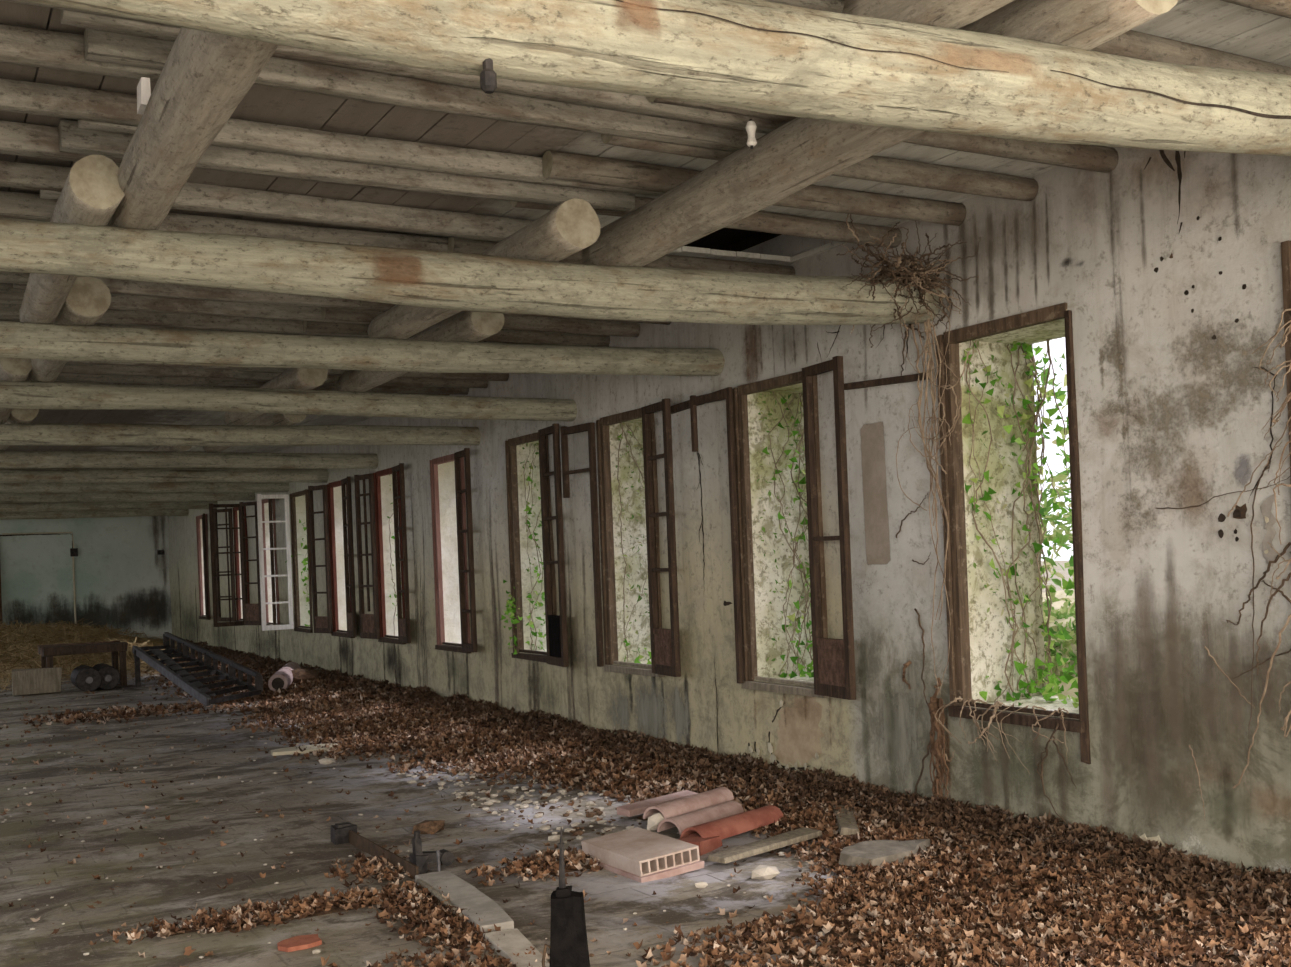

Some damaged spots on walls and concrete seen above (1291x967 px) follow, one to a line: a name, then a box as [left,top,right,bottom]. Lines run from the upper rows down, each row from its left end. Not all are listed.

crack [1050,70,1291,119]
damp [945,218,1018,323]
damp [1033,200,1049,290]
damp [1093,324,1269,498]
damp [9,573,198,641]
damp [1116,623,1277,837]